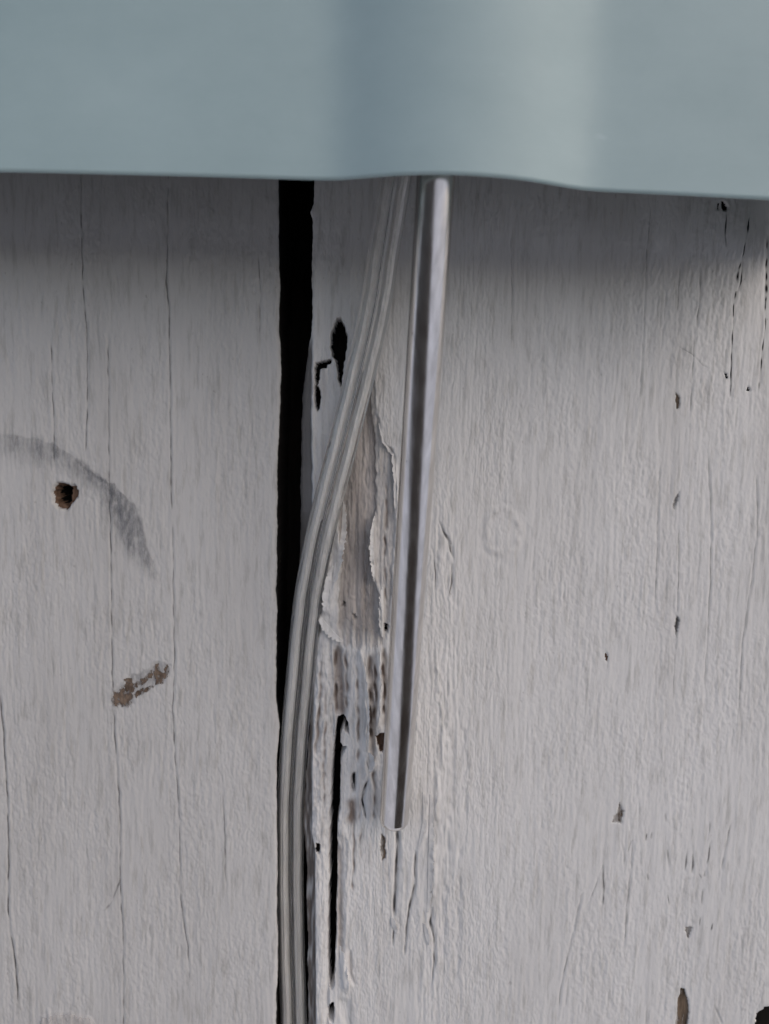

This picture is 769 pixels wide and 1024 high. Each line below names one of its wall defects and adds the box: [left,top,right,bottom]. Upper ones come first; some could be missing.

crack [725,217,768,392]
peeling [319,395,396,772]